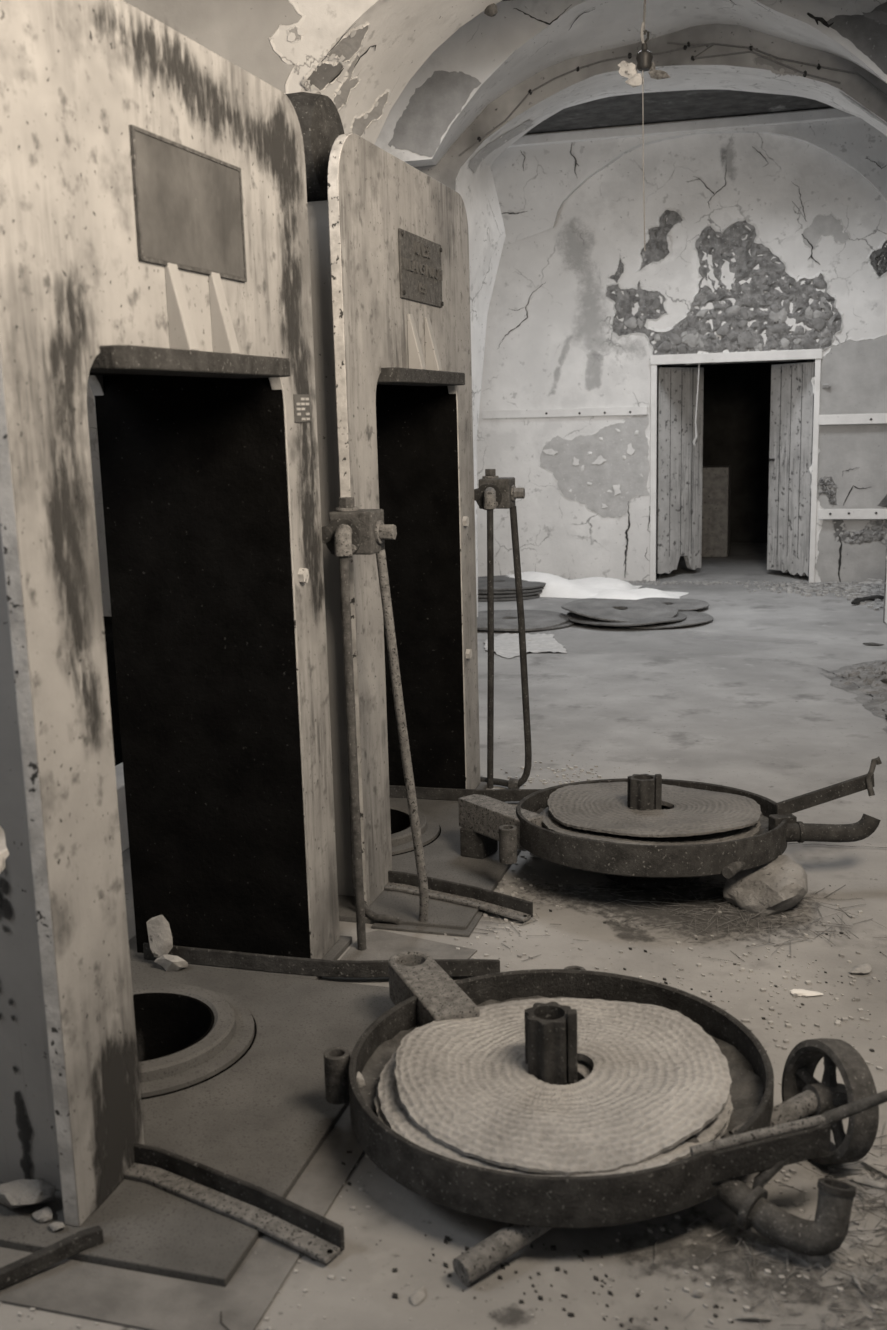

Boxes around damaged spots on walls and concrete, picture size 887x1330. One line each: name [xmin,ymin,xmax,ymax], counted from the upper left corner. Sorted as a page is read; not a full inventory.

peeling [123,0,481,157]
crack [686,146,819,263]
crack [499,282,546,345]
flaking render [605,207,887,583]